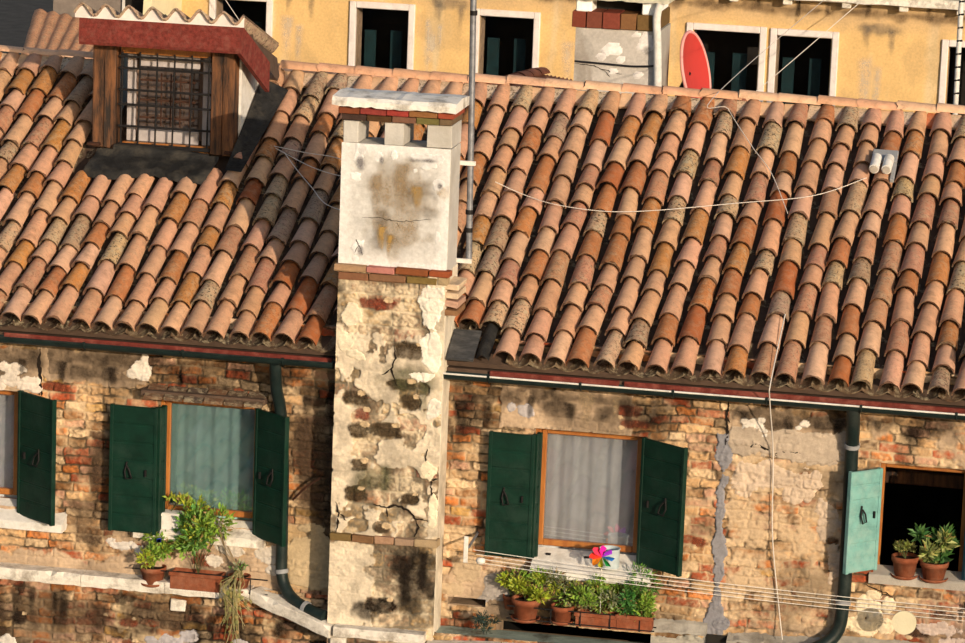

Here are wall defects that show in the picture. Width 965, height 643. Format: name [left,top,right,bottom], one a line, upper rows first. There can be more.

flaking render [595,42,625,74]
water stain [372,165,421,244]
peeling [375,262,441,270]
flaking render [338,297,398,361]
flaking render [0,360,67,394]
flaking render [127,354,152,381]
flaking render [389,285,445,420]
spalling [342,389,402,439]
flaking render [419,461,438,482]
spalling [344,486,366,502]
flaking render [401,492,438,528]
flaking render [728,417,846,585]